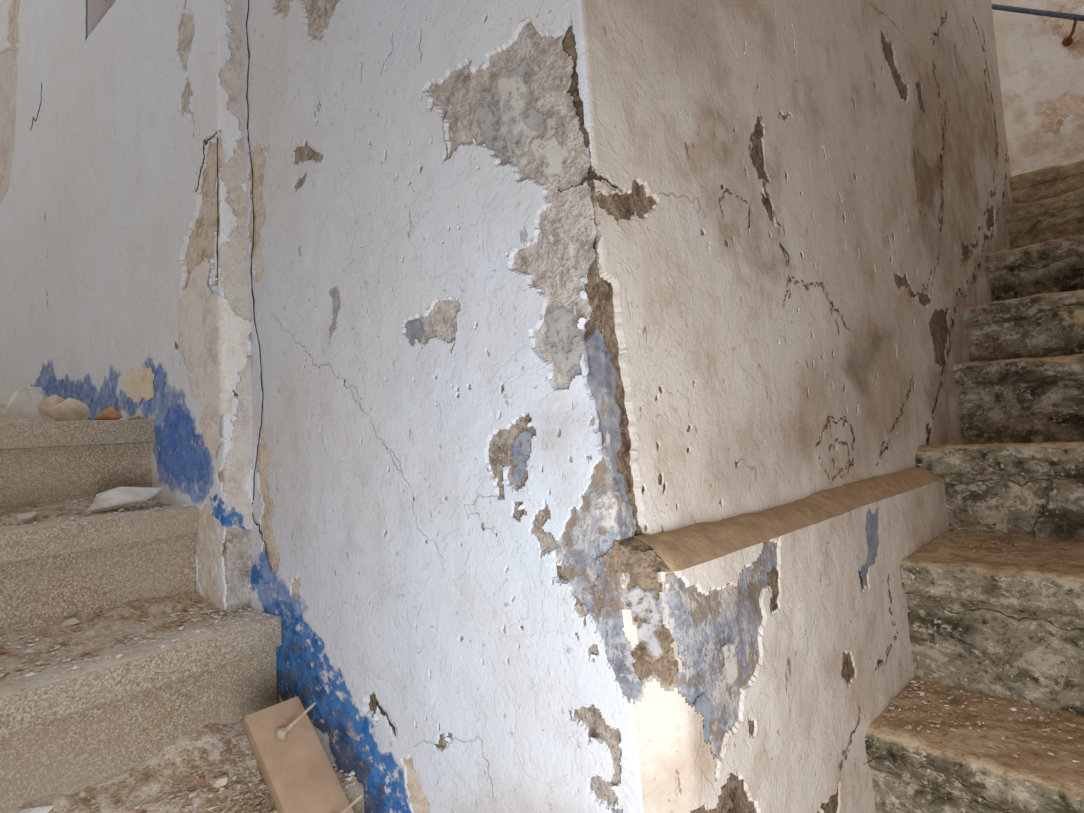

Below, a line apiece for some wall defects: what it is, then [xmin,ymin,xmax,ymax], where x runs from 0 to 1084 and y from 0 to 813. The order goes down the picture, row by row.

peeling [881,31,925,115]
flaking render [177,0,268,320]
crack [558,172,623,193]
crack [749,111,849,334]
flaking render [405,296,460,354]
flaking render [421,16,779,758]
flaking render [195,352,280,614]
peeling [841,652,855,684]
flaking render [403,724,497,813]
peeling [569,704,624,813]
peeling [692,770,757,813]
peeling [818,789,838,813]